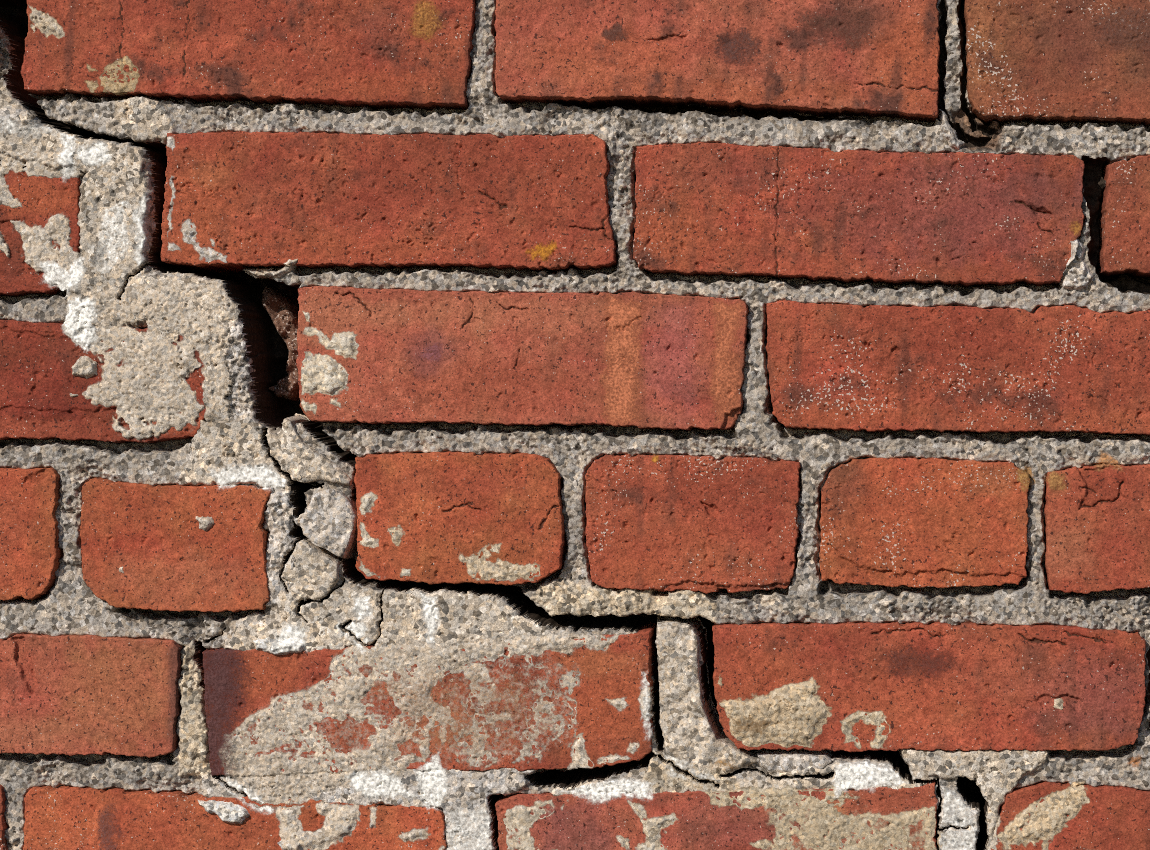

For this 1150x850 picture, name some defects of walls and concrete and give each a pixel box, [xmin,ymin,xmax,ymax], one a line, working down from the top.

crack [859,82,939,92]
peeling [0,214,83,281]
peeling [168,219,227,263]
crack [0,0,357,592]
crack [336,292,372,317]
crack [462,298,526,329]
spalling [0,405,165,443]
crack [193,628,227,694]
peeling [446,632,621,686]
crack [297,558,989,850]
peeling [567,733,639,770]
peeling [985,816,1000,850]